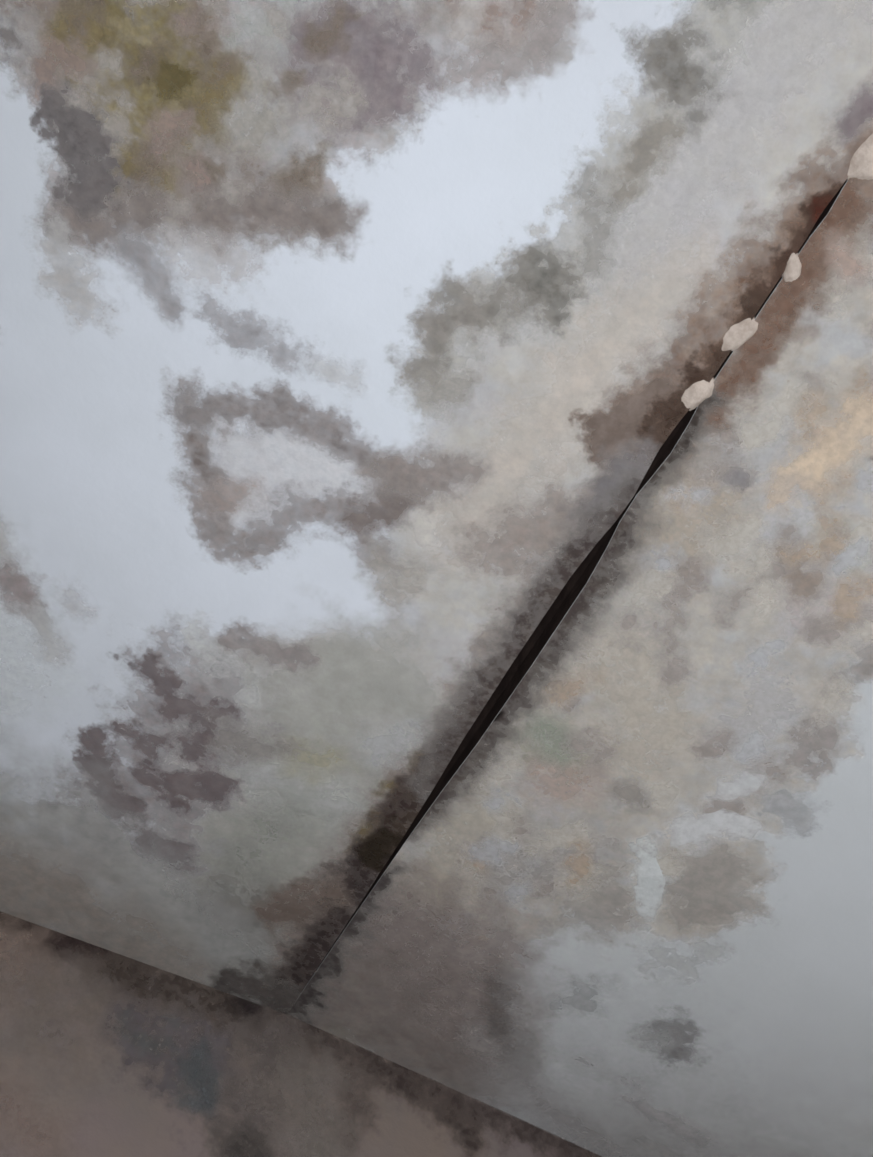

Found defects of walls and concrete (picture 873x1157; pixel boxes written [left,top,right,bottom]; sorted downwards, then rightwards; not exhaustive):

damp [0,0,575,371]
damp [400,0,771,418]
crack [713,351,733,378]
crack [754,276,782,318]
crack [797,179,847,254]
damp [0,379,725,1157]
crack [309,408,697,981]